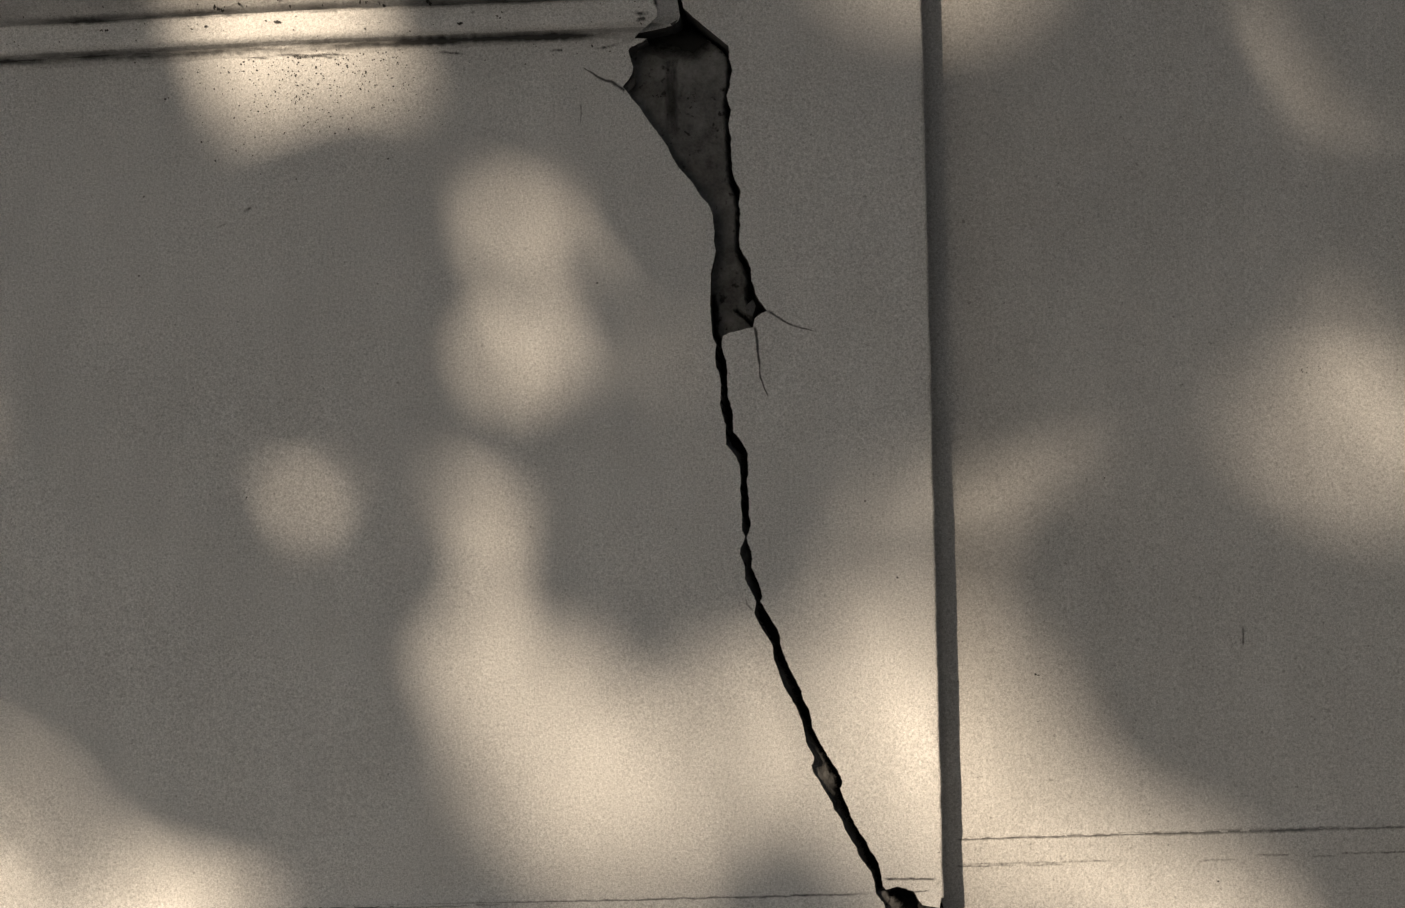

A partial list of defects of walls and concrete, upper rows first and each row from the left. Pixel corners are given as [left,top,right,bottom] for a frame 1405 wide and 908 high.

crack [677,0,688,24]
flaking render [584,9,812,395]
crack [471,331,933,905]
flaking render [876,887,943,908]